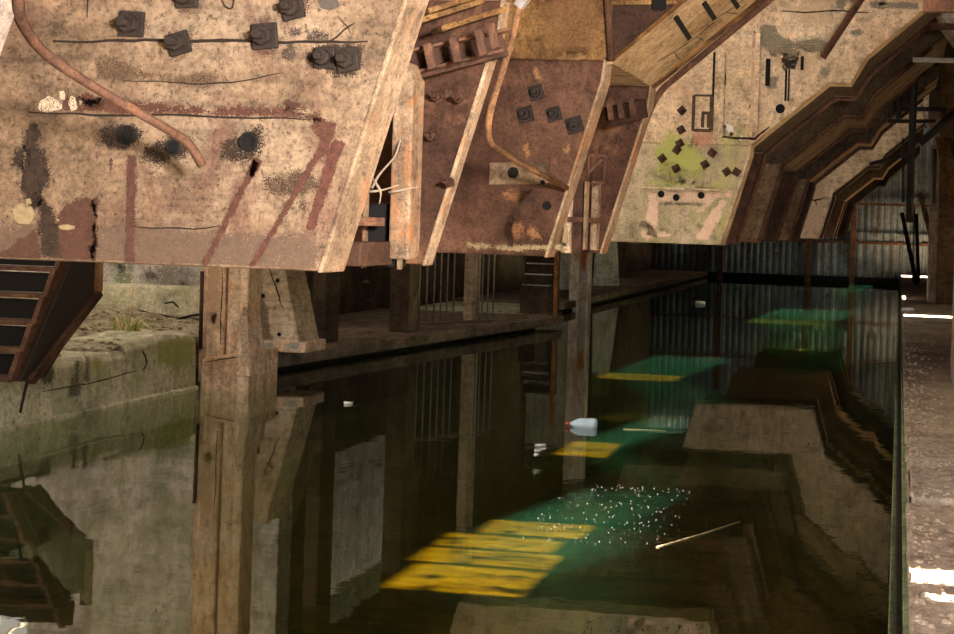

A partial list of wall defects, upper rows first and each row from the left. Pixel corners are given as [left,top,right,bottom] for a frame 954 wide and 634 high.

leakage [96,121,198,169]
leakage [216,122,270,167]
leakage [0,116,69,258]
rust [62,89,345,266]
leakage [259,167,321,211]
rust [501,185,543,246]
leakage [85,220,318,286]